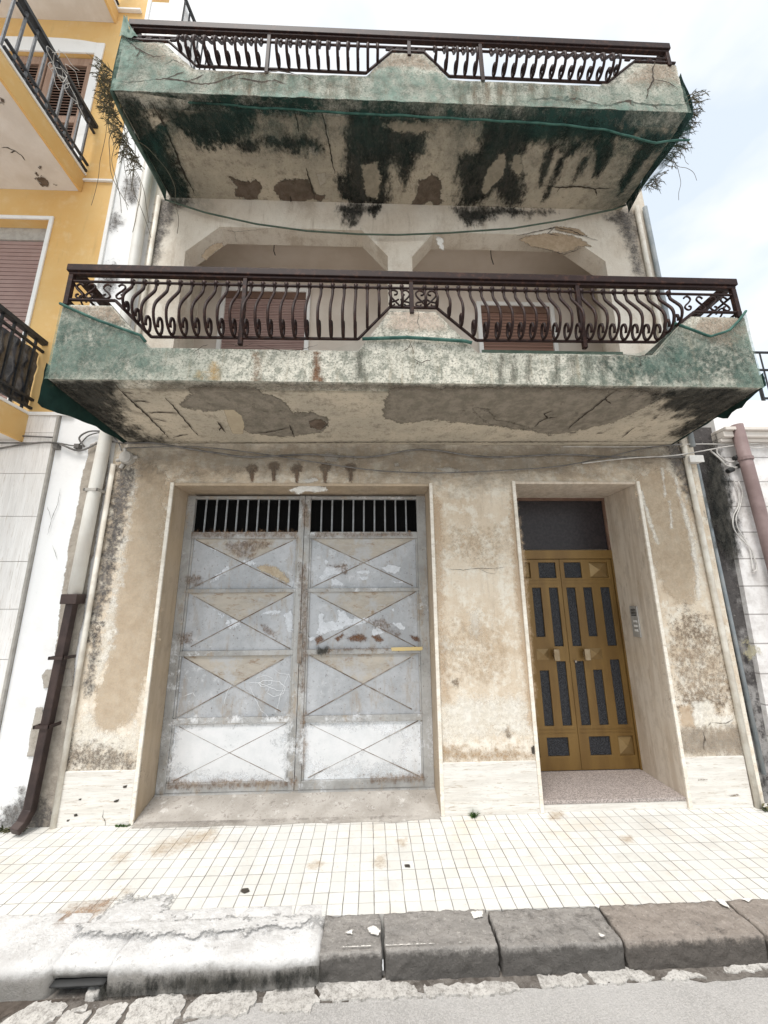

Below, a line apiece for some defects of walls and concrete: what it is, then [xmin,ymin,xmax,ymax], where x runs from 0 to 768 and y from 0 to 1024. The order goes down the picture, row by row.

crack [527,62,688,109]
water stain [118,72,325,265]
spalling [229,176,325,202]
water stain [337,107,429,228]
spalling [411,173,443,205]
crack [115,384,225,444]
spalling [180,386,329,437]
crack [262,391,676,443]
spalling [382,386,664,436]
water stain [555,355,756,598]
water stain [84,465,140,695]
rust [300,562,399,665]